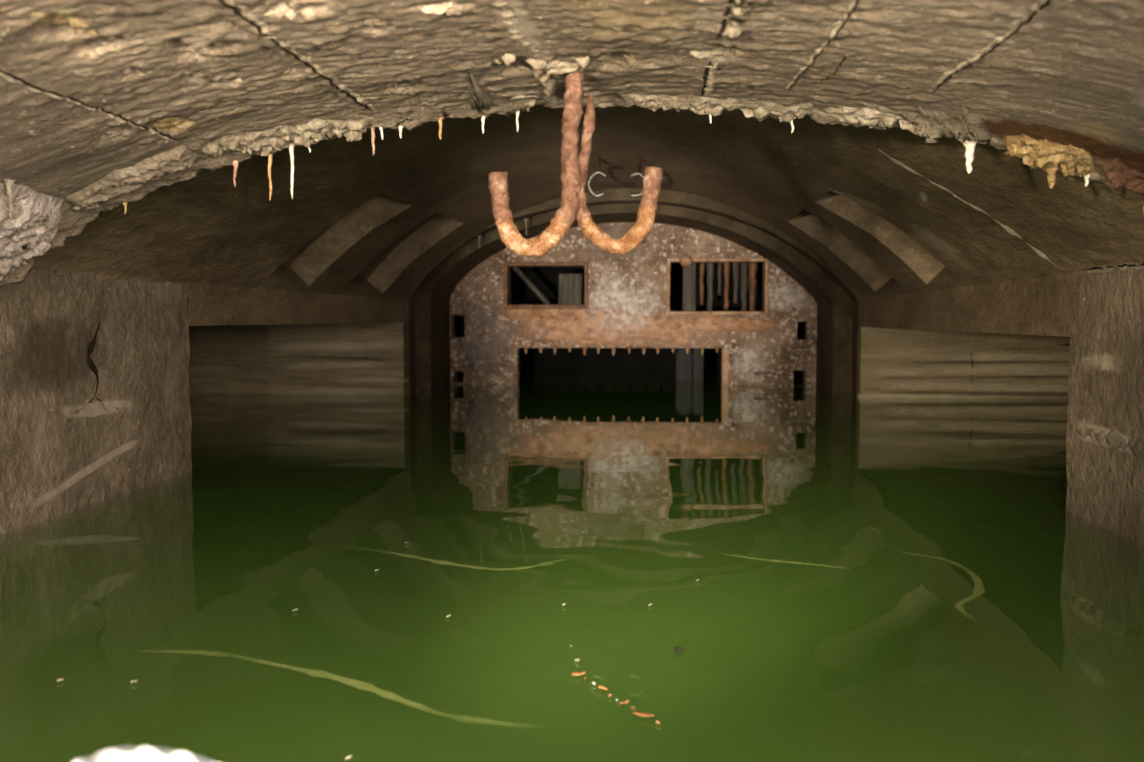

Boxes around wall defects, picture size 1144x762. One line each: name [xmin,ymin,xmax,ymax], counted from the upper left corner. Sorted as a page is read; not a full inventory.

crack [218,0,377,112]
crack [928,0,1051,94]
crack [0,69,178,142]
leakage [187,111,413,157]
leakage [468,72,560,118]
leakage [618,93,1144,198]
corrosion [986,121,1144,173]
spalling [0,115,201,280]
corrosion [600,225,628,239]
corrosion [586,238,645,262]
crack [878,149,1144,274]
corrosion [507,309,774,345]